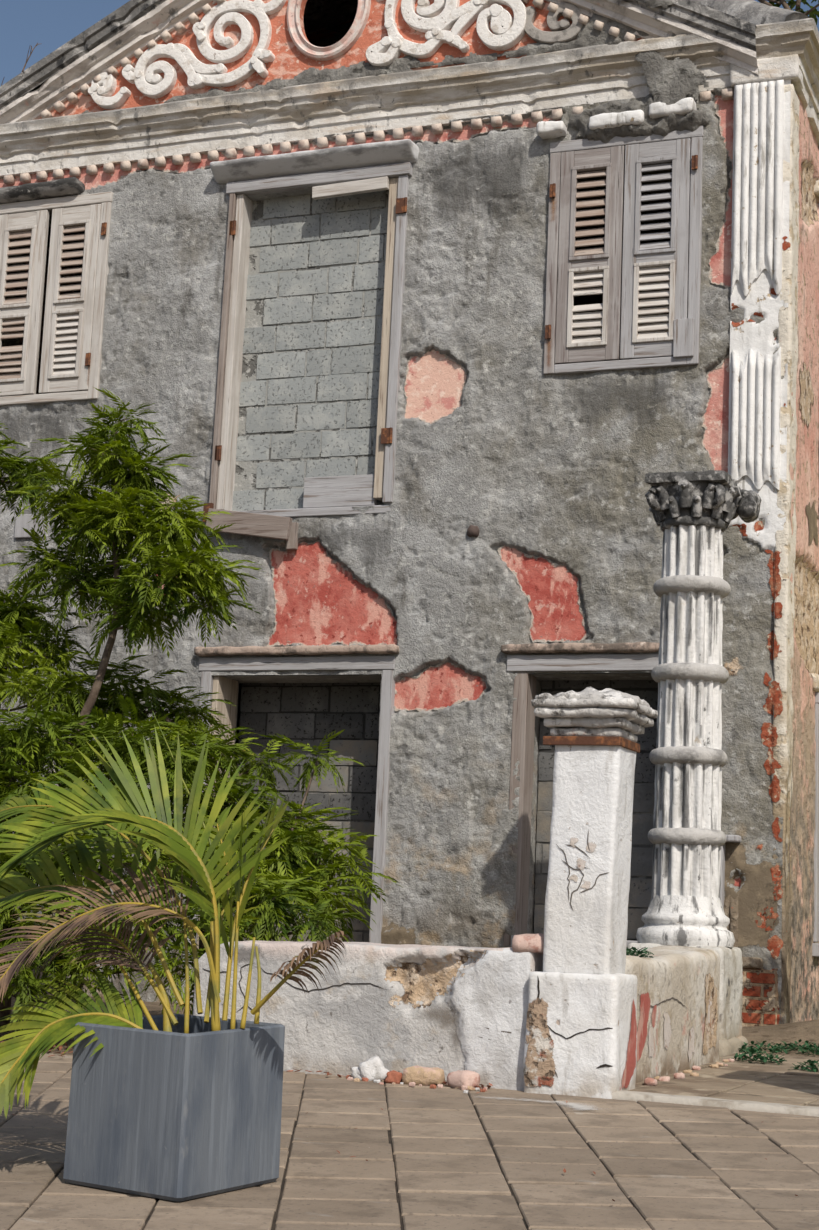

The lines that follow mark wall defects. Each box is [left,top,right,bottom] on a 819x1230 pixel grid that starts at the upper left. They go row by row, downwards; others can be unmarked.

peeling [404,350,467,424]
peeling [701,353,730,473]
spalling [732,489,764,538]
peeling [267,540,398,647]
peeling [497,545,593,643]
peeling [394,662,488,712]
spalling [724,500,819,1027]
spalling [381,922,416,945]
crack [202,964,386,1011]
spalling [384,949,487,1009]
spalling [523,997,556,1087]
peeling [620,993,672,1090]